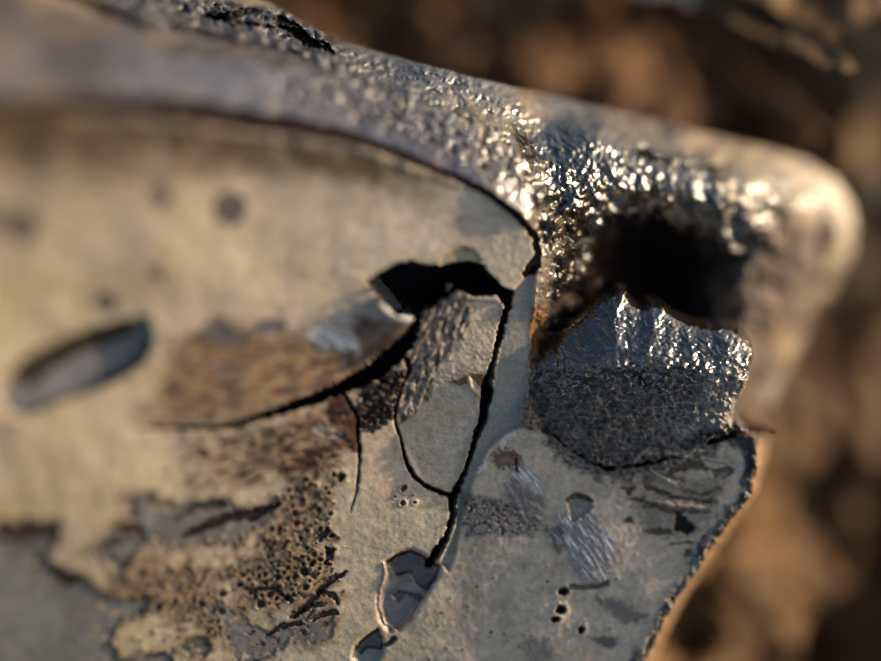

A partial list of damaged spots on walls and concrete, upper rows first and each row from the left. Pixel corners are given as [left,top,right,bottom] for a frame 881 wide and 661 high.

crack [77,0,335,57]
spalling [0,317,153,417]
crack [42,95,541,566]
corrosion [95,315,409,641]
peeling [451,414,546,538]
peeling [0,474,340,661]
crack [383,636,396,647]